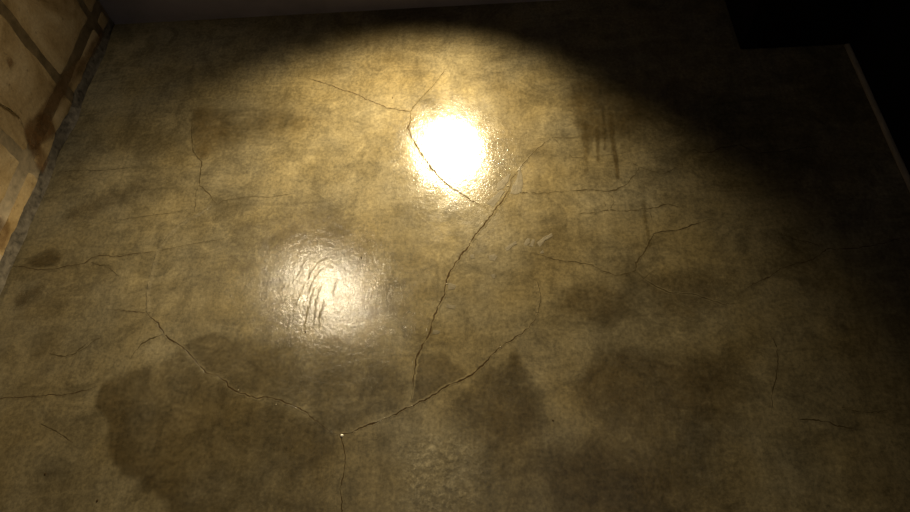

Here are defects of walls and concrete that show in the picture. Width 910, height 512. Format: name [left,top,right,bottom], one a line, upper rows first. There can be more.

crack [0,66,712,512]
water stain [186,334,306,395]
water stain [401,432,478,512]